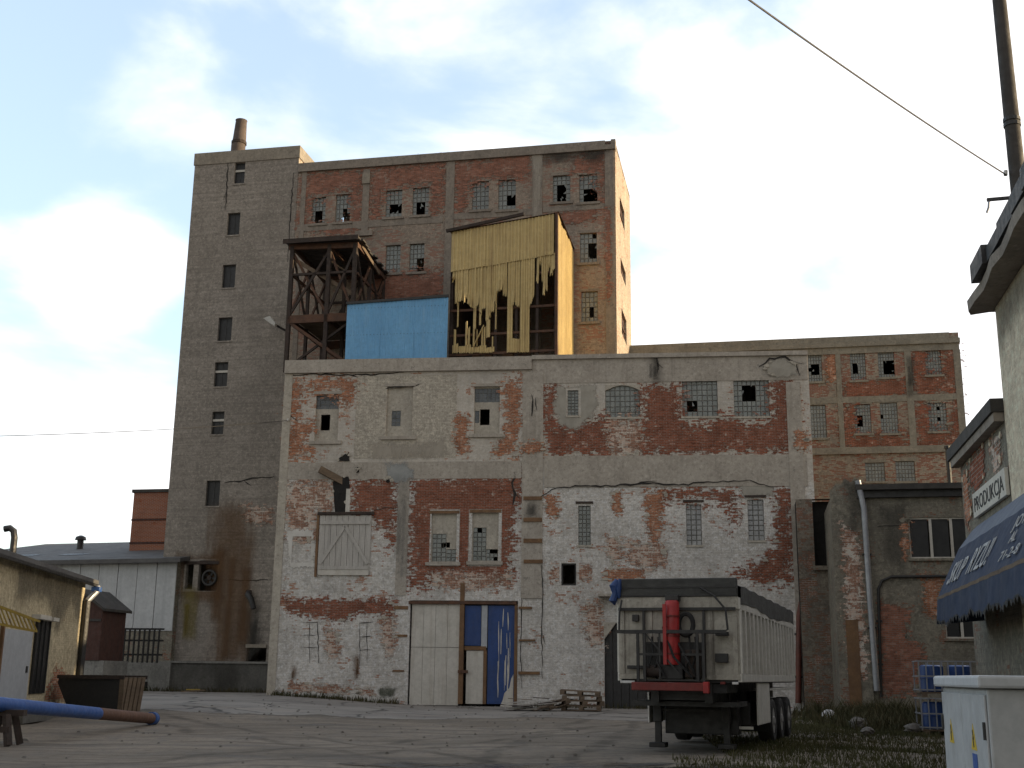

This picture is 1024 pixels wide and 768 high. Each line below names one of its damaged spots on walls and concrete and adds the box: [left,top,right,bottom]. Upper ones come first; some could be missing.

crack [286,173,294,262]
crack [225,476,274,485]
flaking render [236,358,812,663]
crack [511,478,771,504]
flaking render [835,520,945,702]